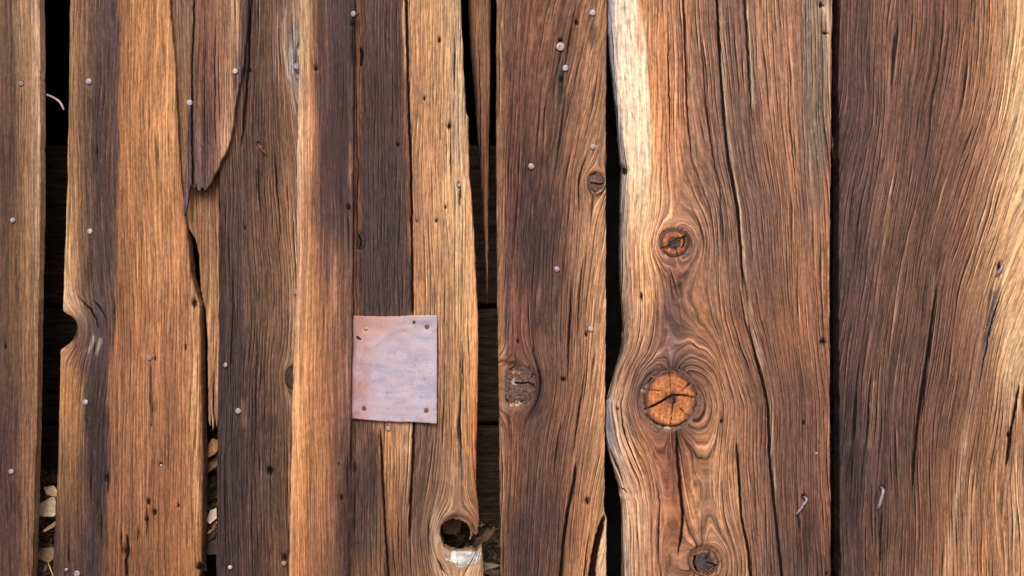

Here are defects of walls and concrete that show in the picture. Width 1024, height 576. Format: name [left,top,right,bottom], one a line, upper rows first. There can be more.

crack [191,0,216,186]
crack [667,0,744,283]
crack [553,262,605,576]
crack [736,440,752,576]
crack [748,325,783,576]
crack [912,286,937,487]